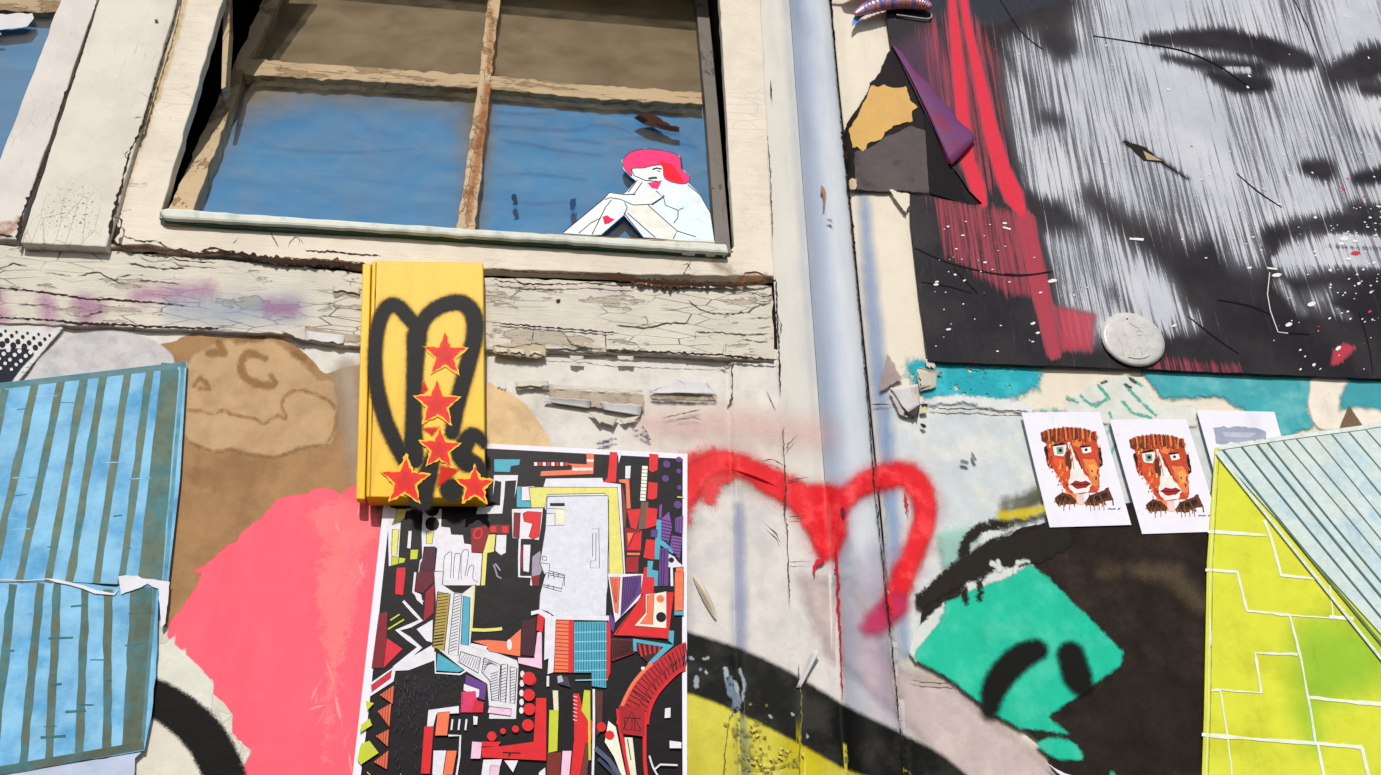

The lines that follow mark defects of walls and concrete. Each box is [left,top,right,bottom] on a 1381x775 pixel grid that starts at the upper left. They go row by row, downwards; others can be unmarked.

rust [467,12,493,220]
peeling [332,285,360,298]
peeling [282,325,361,344]
peeling [493,343,546,358]
peeling [568,337,601,361]
peeling [497,379,717,444]